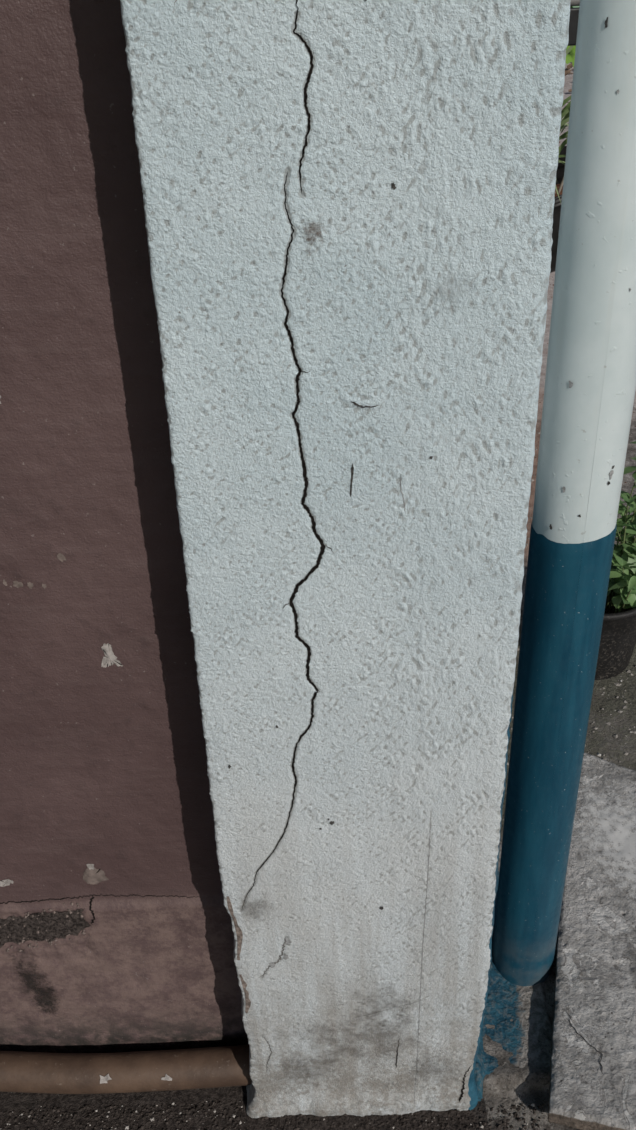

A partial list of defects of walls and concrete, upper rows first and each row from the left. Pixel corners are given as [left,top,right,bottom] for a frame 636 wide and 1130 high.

crack [242,0,334,909]
peeling [101,643,123,668]
spalling [0,902,91,952]
crack [0,894,201,925]